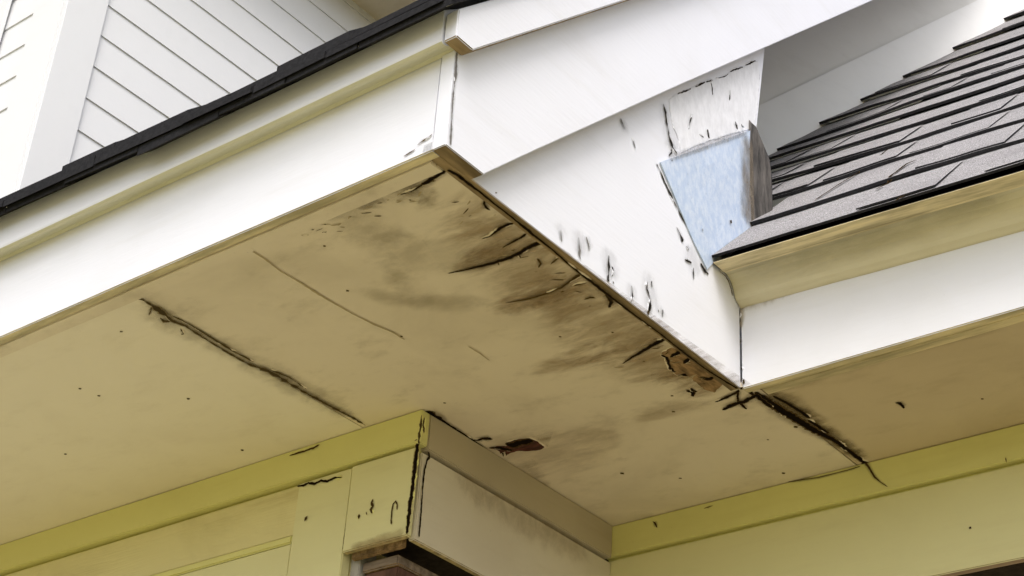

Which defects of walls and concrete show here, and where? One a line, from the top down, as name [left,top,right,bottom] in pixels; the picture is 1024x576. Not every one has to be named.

crack [253,251,405,340]
crack [139,298,365,425]
peeling [660,347,722,397]
crack [715,387,774,410]
crack [289,445,319,456]
crack [297,476,342,487]
crack [357,415,430,537]
crack [789,462,886,486]